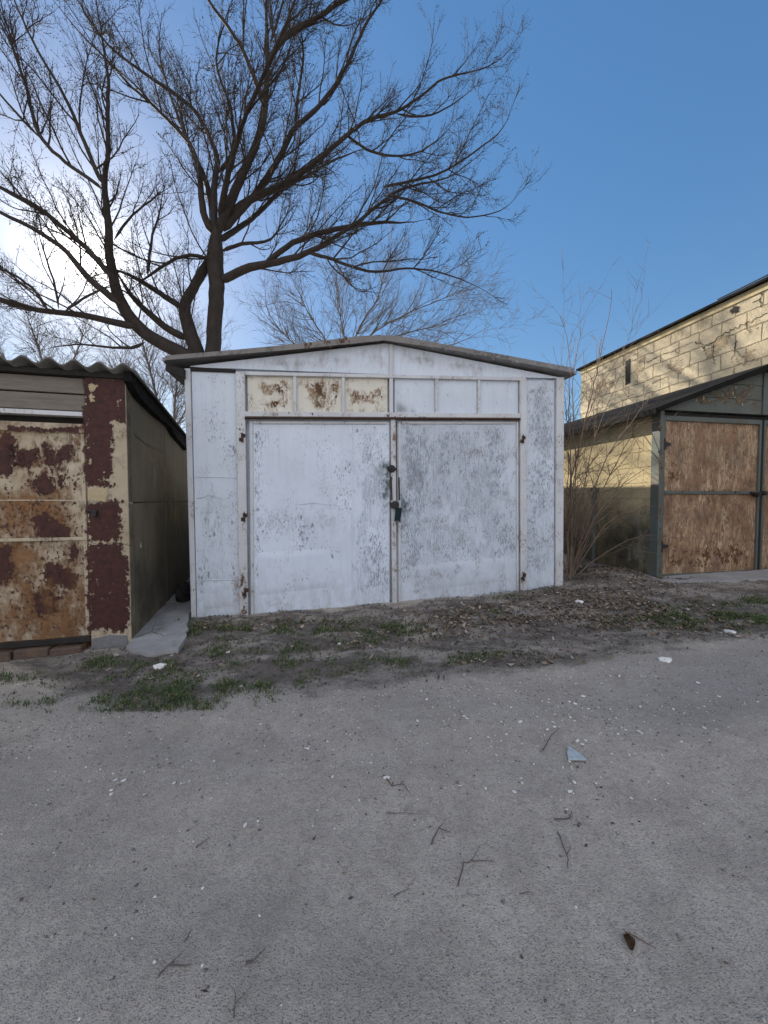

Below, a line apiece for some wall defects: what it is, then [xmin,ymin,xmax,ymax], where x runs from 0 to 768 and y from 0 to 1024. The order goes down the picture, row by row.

rust [261,381,289,416]
rust [307,382,339,415]
rust [0,447,85,651]